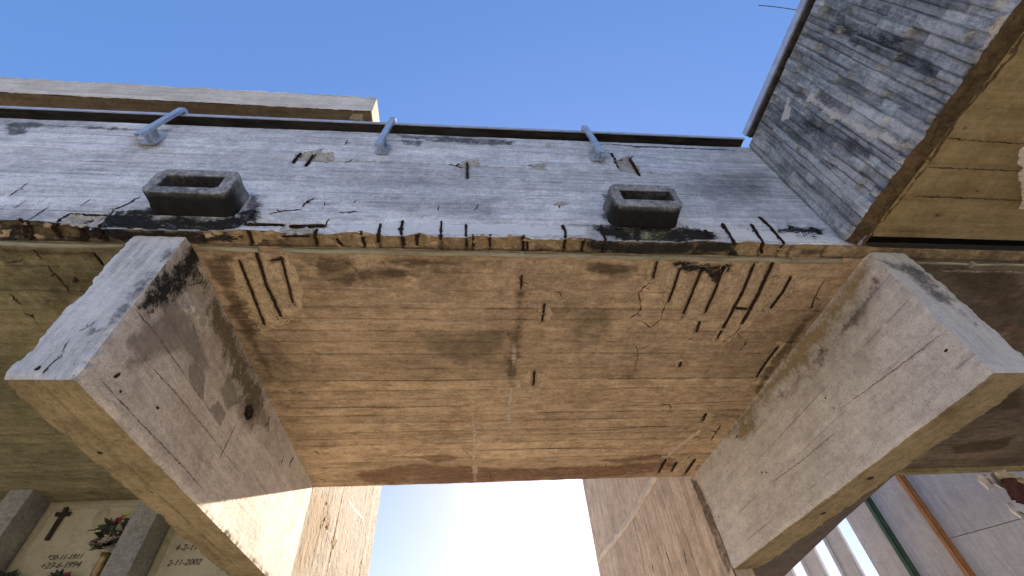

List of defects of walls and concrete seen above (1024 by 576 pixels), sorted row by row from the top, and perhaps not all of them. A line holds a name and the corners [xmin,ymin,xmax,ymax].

spalling [0,0,1024,347]
damp [82,196,266,366]
damp [580,214,737,283]
damp [778,225,823,254]
crack [626,282,668,380]